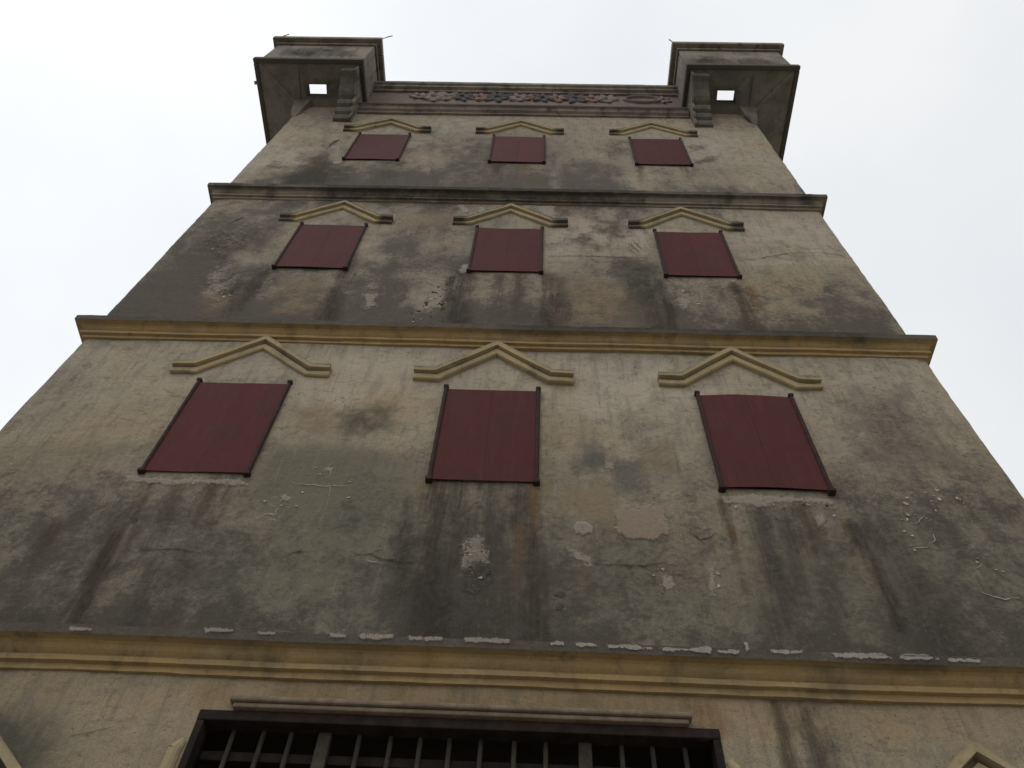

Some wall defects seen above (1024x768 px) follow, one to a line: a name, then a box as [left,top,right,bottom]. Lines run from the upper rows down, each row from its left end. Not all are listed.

water stain [290,159,629,216]
flaking render [460,535,493,594]
peeling [550,641,749,654]
peeling [832,652,980,662]